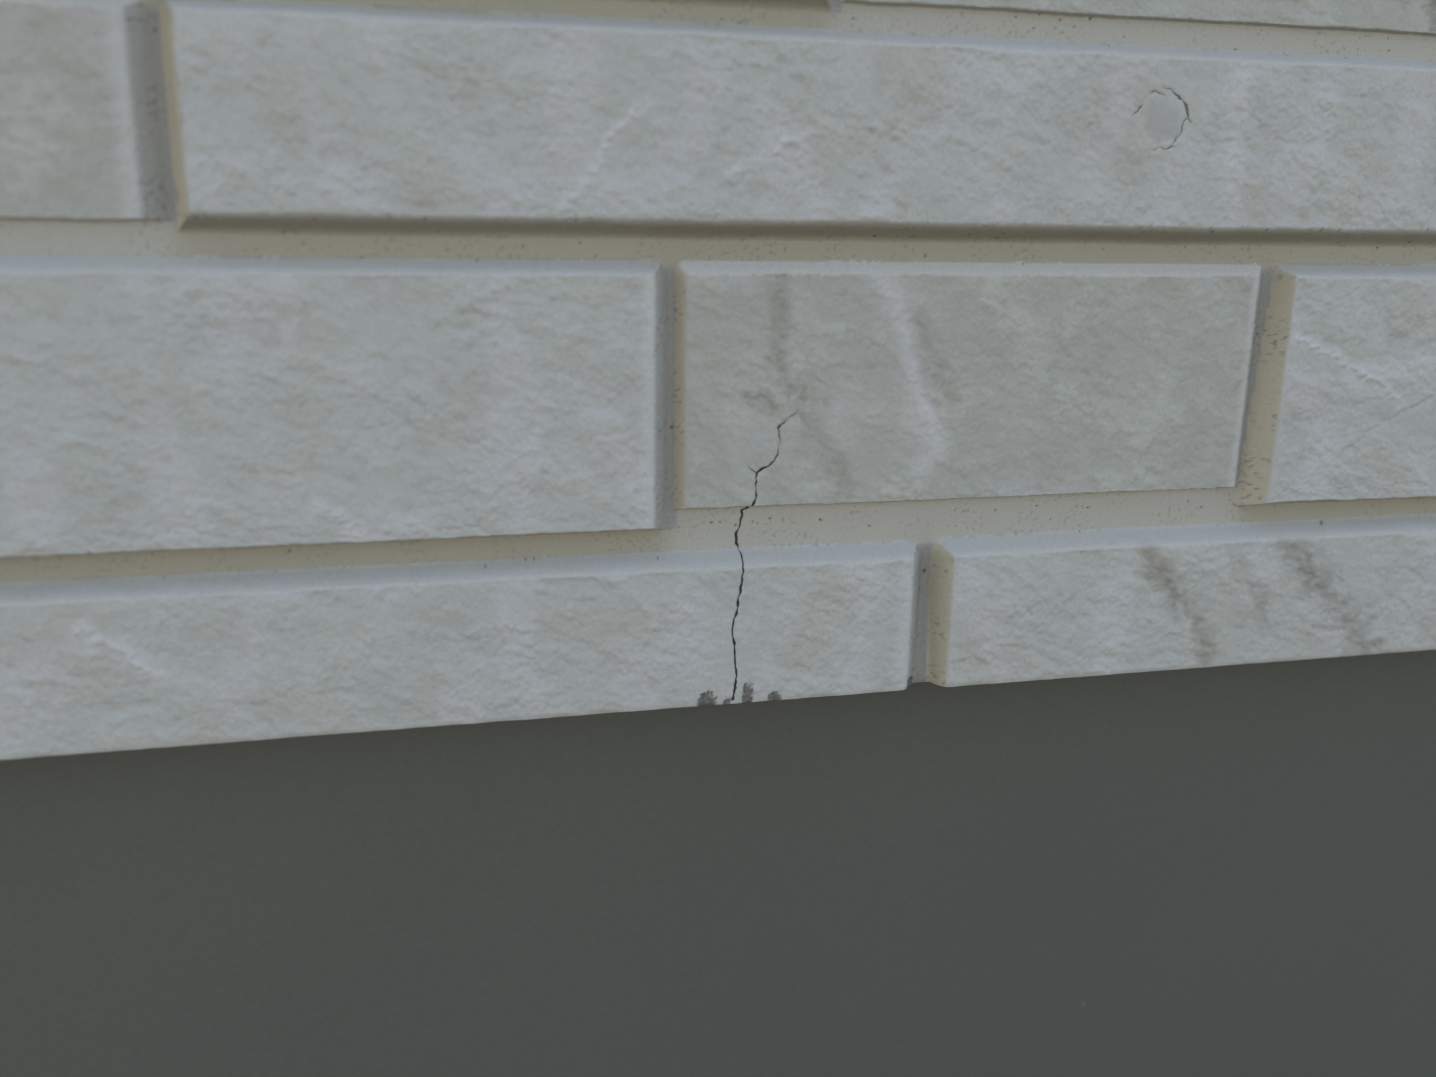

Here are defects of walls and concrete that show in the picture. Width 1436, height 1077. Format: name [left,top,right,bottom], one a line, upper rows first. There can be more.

crack [731,413,796,700]